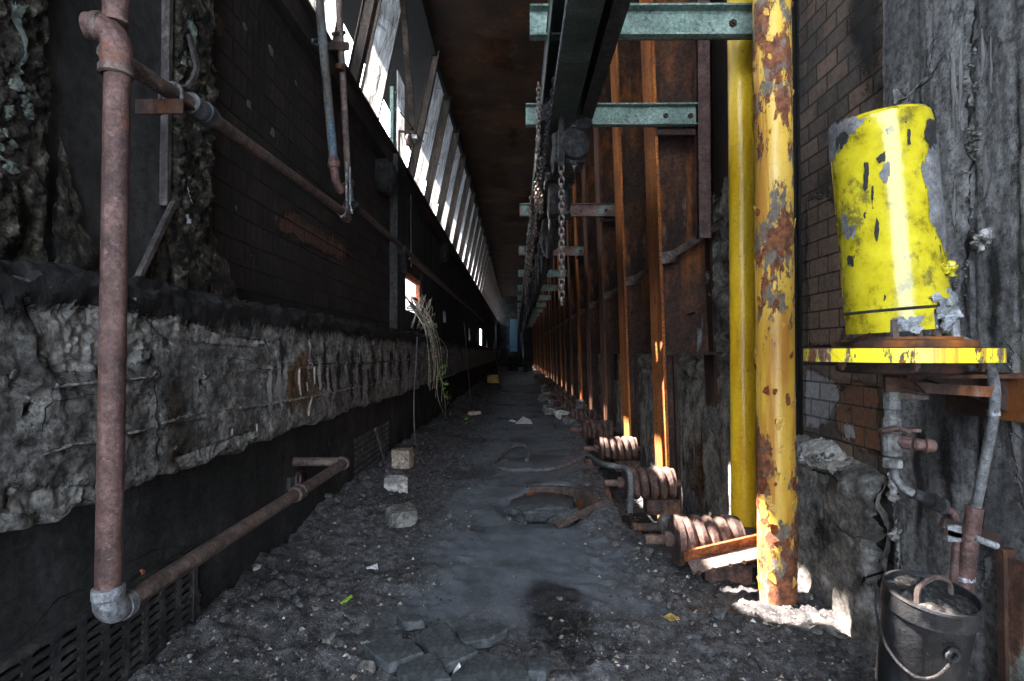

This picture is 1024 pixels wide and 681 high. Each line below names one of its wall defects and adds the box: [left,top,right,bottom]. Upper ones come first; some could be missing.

peeling [827,115,865,161]
peeling [879,161,890,183]
peeling [921,133,960,277]
crack [953,6,977,306]
spalling [24,294,99,374]
spalling [127,297,272,365]
crack [42,375,97,438]
crack [133,373,160,467]
spalling [174,431,264,467]
rust [286,352,324,415]
spalling [6,477,96,521]
crack [800,464,888,588]